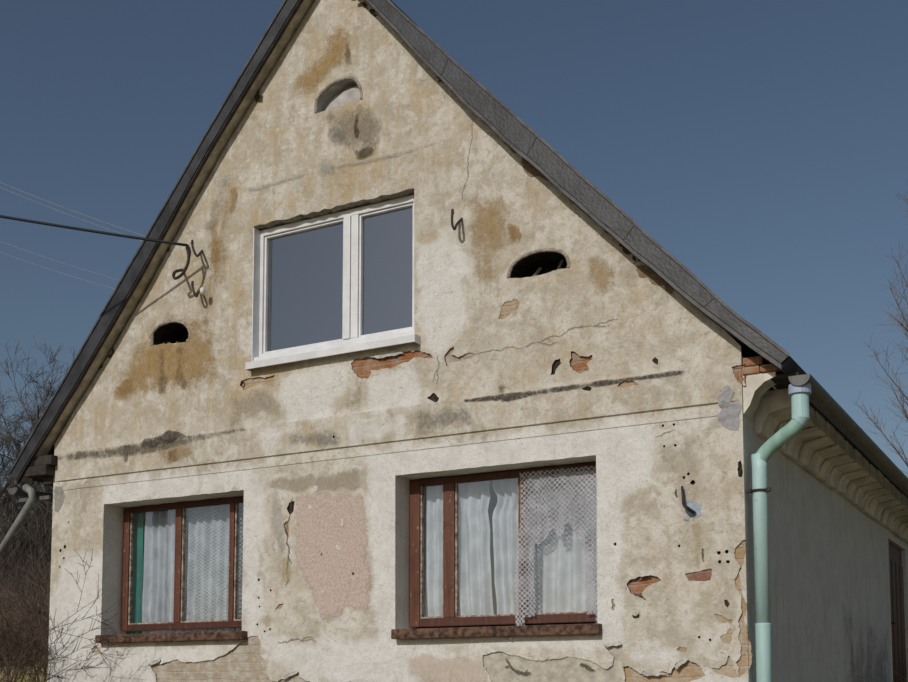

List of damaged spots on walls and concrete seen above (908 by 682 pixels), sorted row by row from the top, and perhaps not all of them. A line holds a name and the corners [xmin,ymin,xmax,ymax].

water stain [330,112,377,159]
flaking render [351,350,433,379]
flaking render [444,347,475,366]
flaking render [499,299,519,319]
crack [476,319,617,354]
flaking render [551,351,592,375]
water stain [69,394,276,462]
water stain [419,371,682,430]
crack [284,500,292,585]
peeling [272,471,371,619]
flaking render [482,540,753,682]
flaking render [147,623,310,682]